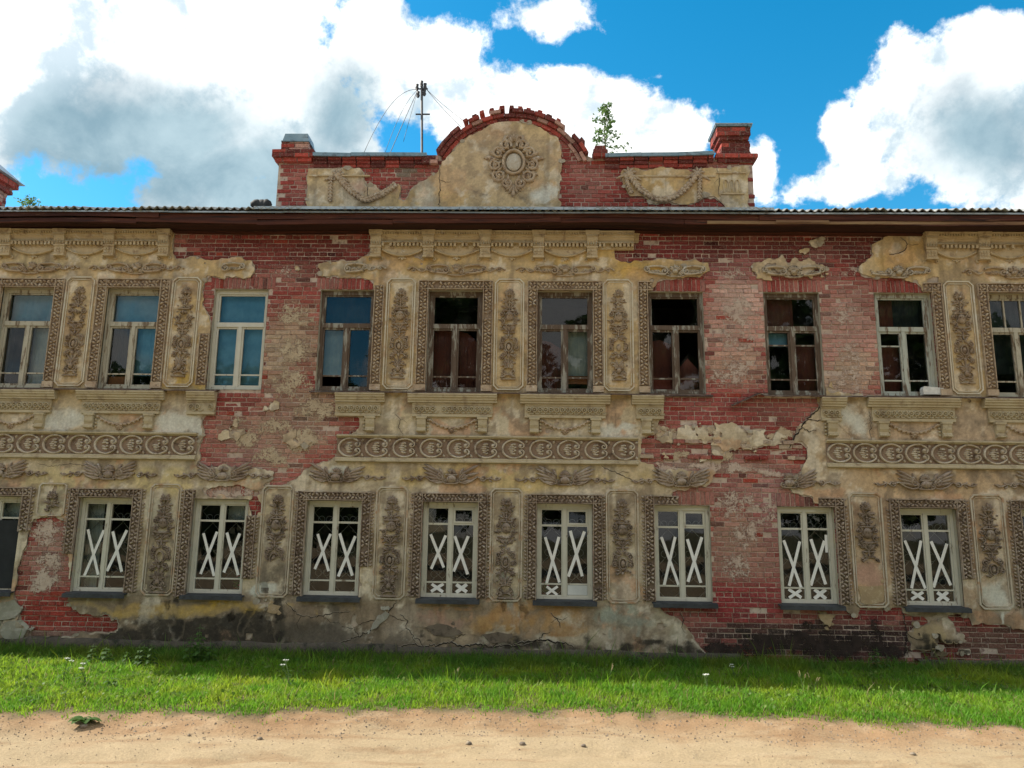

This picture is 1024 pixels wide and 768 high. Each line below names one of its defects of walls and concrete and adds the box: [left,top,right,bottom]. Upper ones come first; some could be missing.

flaking render [0,499,118,639]
flaking render [206,485,261,515]
flaking render [174,234,373,485]
crack [286,602,574,648]
leakage [69,486,970,663]
crack [789,406,820,448]
flaking render [615,234,1024,667]